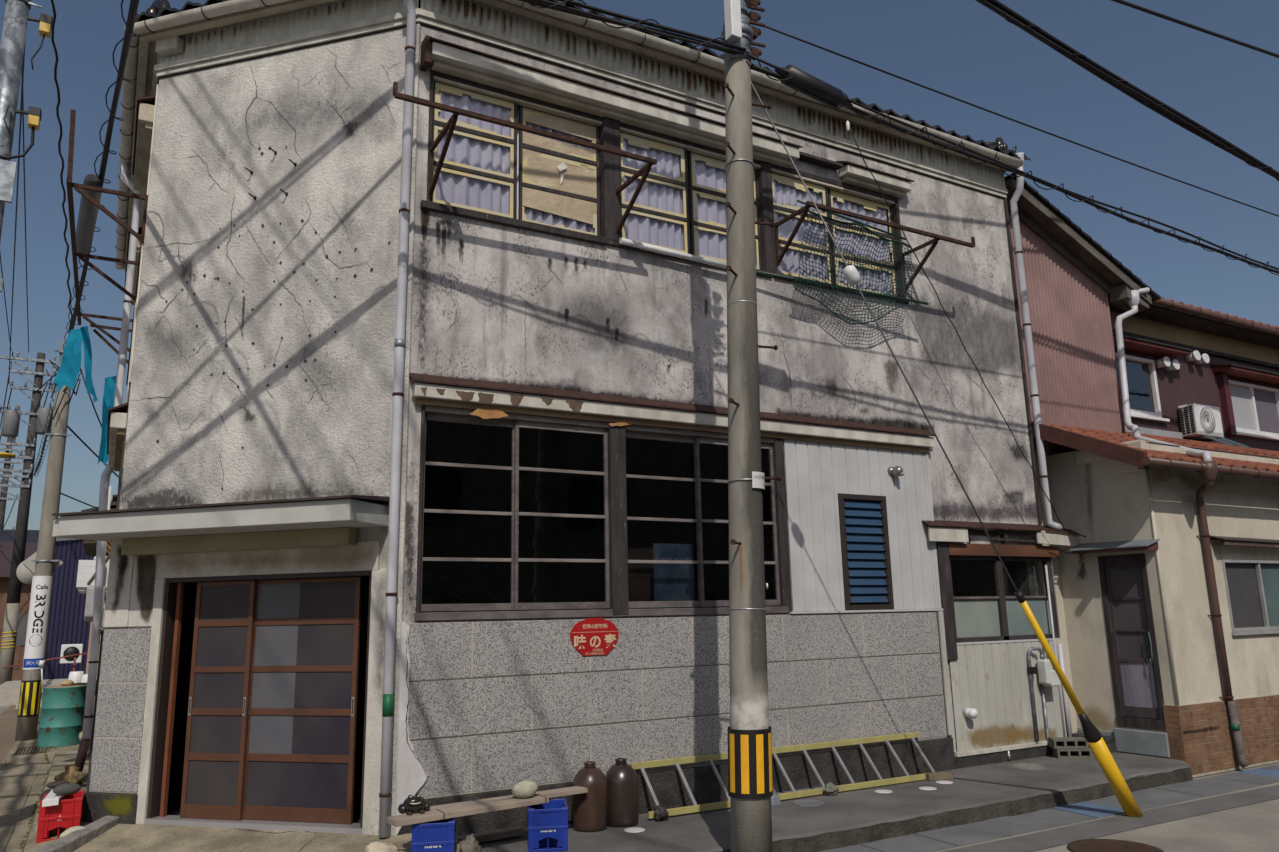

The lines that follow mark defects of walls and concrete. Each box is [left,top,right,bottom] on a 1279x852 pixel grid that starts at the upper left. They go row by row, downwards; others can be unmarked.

corrosion [442,0,512,31]
corrosion [546,27,597,56]
corrosion [614,48,725,97]
crack [245,32,422,159]
corrosion [421,209,429,241]
water stain [419,219,464,360]
crack [121,149,375,506]
peeling [421,387,524,419]
water stain [469,378,724,408]
water stain [777,410,934,432]
water stain [1011,445,1027,459]
water stain [933,491,1038,519]